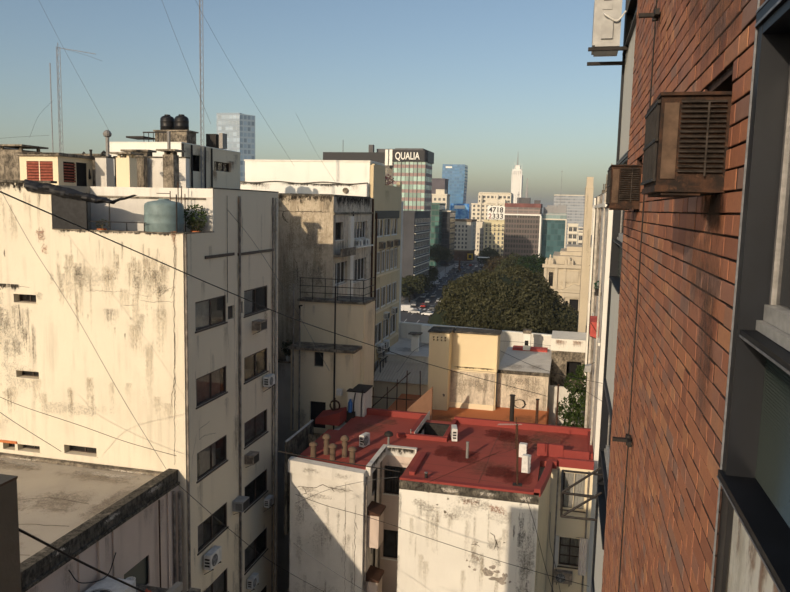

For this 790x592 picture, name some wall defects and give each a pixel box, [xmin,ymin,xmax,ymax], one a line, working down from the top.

water stain [278,183,370,208]
crack [299,484,358,586]
peeling [466,554,511,585]